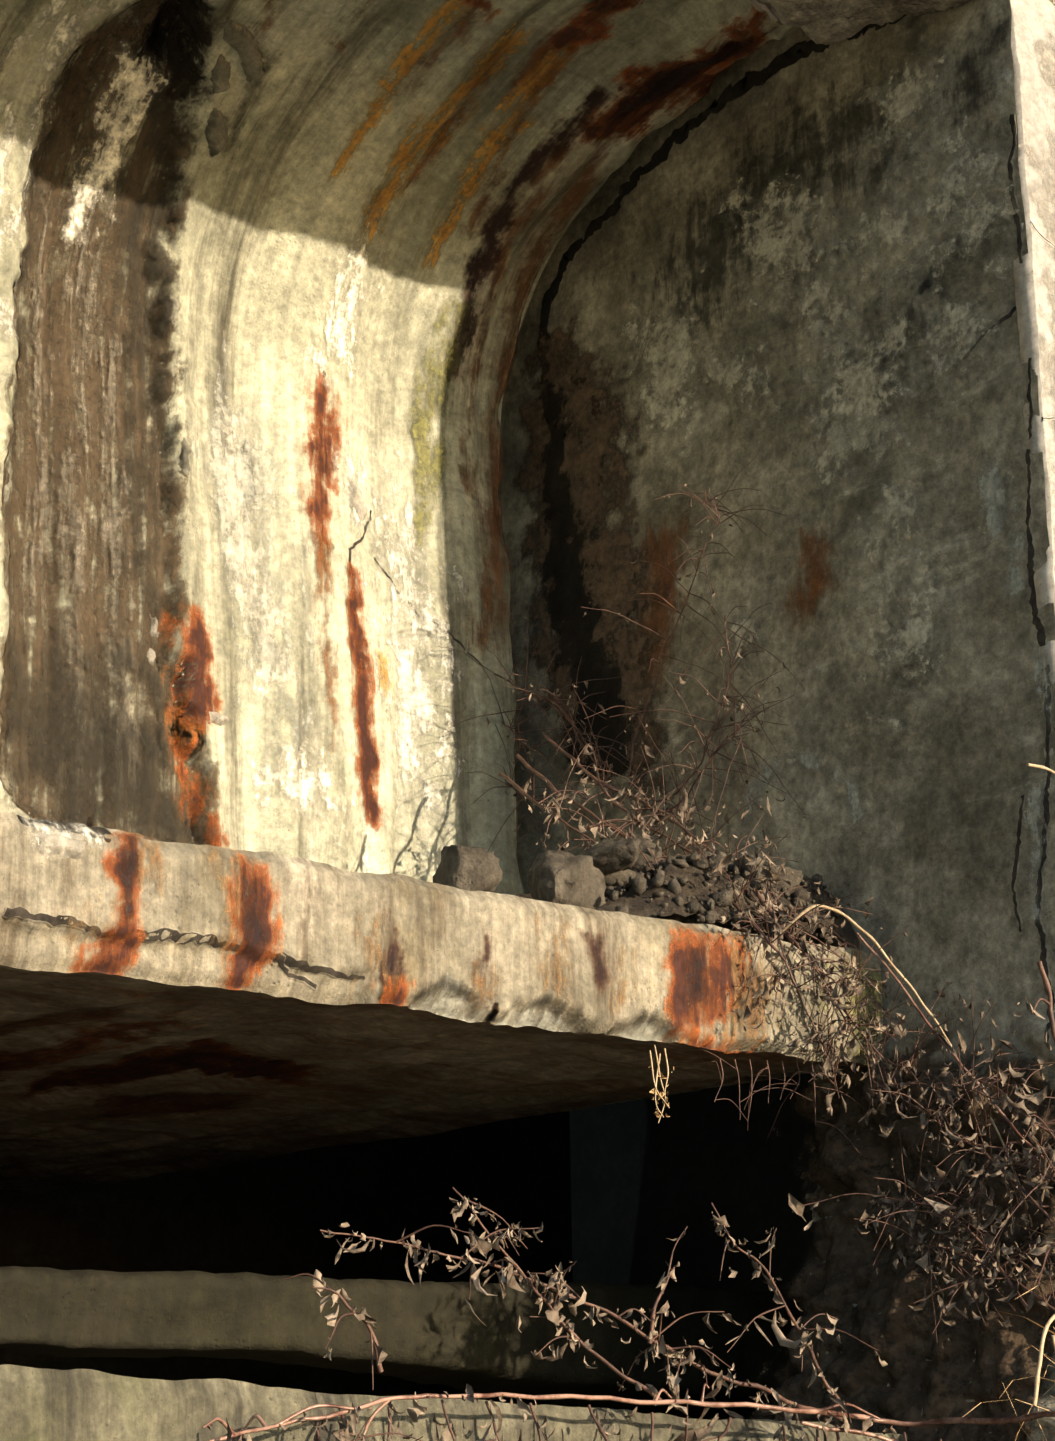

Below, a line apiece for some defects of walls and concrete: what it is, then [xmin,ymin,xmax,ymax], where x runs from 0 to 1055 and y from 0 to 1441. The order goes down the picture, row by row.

crack [1007,114,1055,264]
corrosion [303,0,770,649]
crack [963,304,1017,361]
leakage [0,0,294,847]
corrosion [324,642,338,723]
crack [1011,357,1055,1042]
corrosion [147,604,282,990]
corrosion [68,832,163,976]
crack [2,905,366,991]
corrosion [664,927,778,1054]